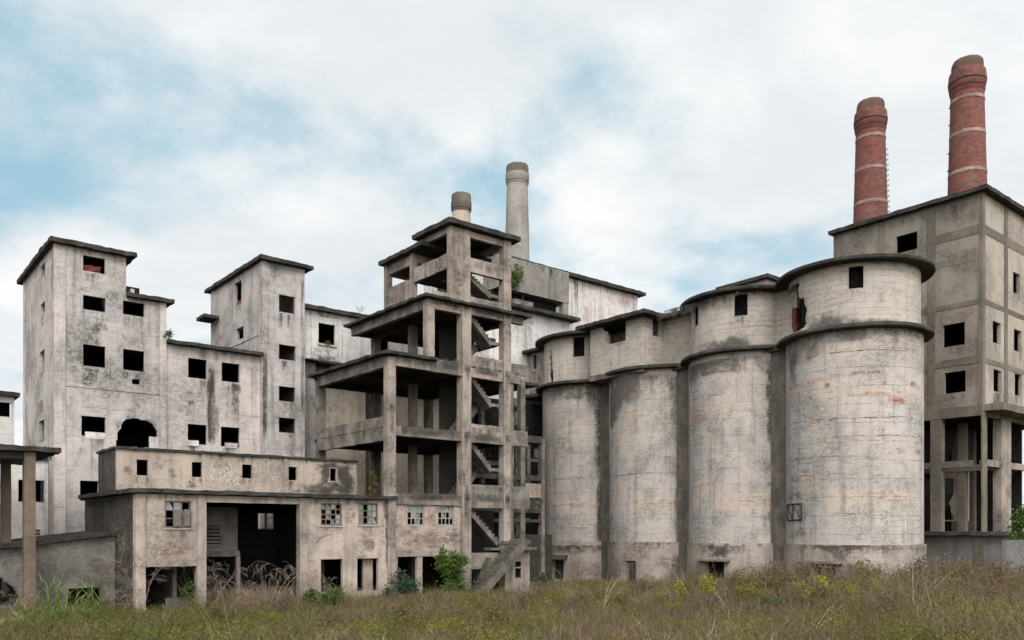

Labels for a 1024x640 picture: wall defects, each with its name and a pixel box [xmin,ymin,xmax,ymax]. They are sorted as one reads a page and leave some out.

water stain [200,368,218,432]
water stain [554,375,654,466]
water stain [290,464,357,501]